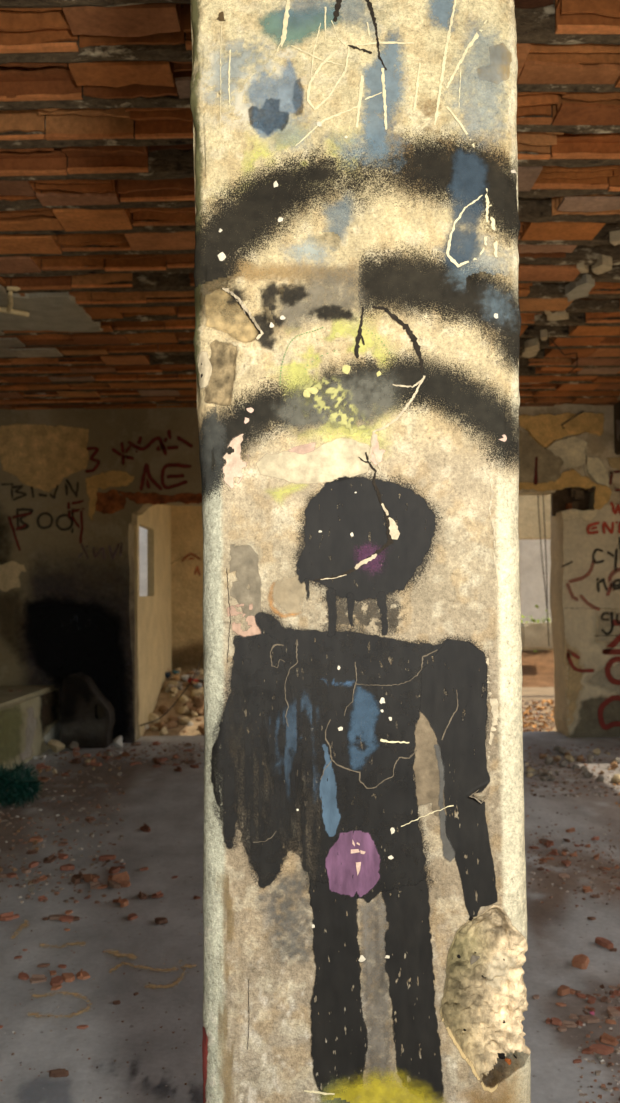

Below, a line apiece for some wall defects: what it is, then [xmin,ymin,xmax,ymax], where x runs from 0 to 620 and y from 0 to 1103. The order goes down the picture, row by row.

flaking render [0,285,103,332]
flaking render [0,424,202,520]
spalling [499,411,620,521]